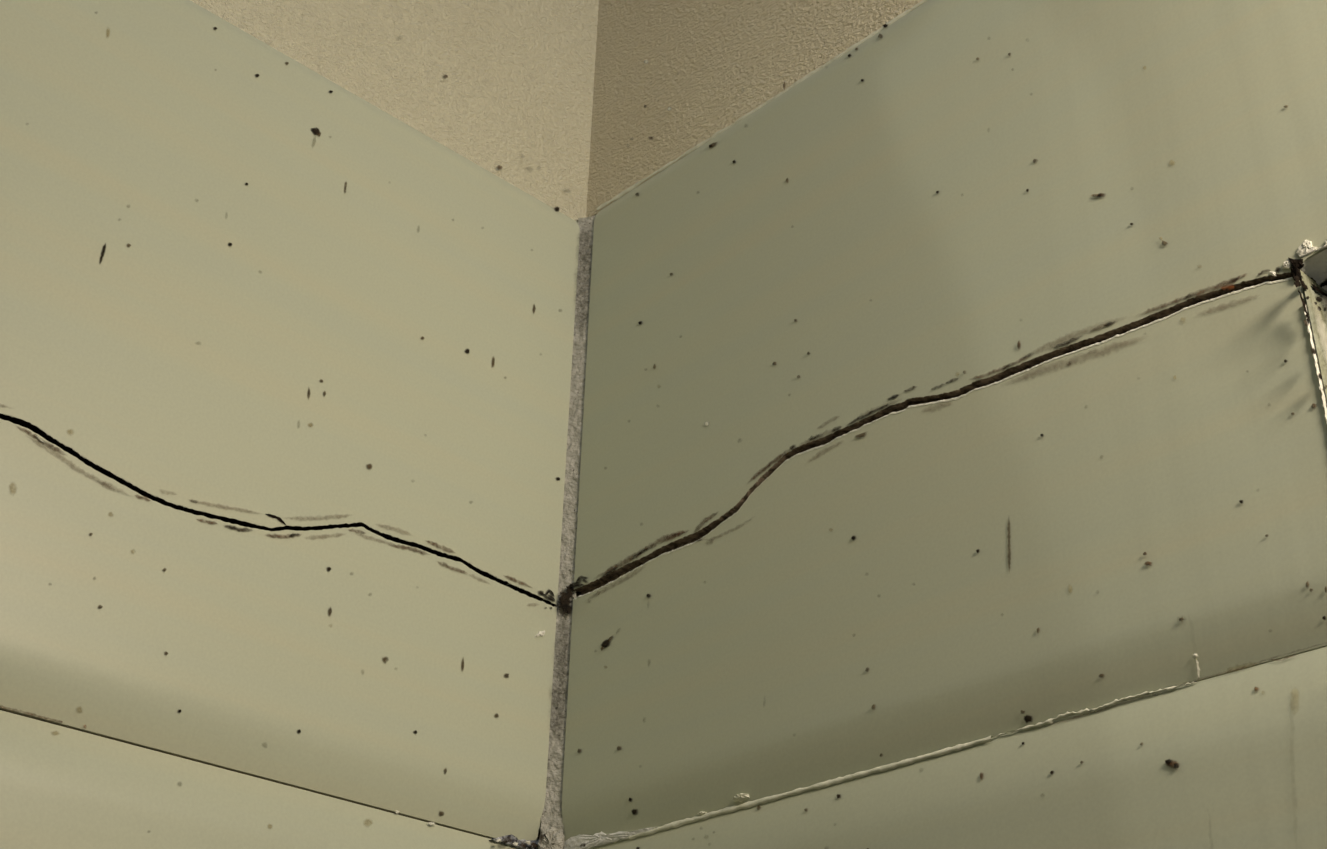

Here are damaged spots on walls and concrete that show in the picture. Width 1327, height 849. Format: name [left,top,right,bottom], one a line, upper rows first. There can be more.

crack [0,257,1327,609]